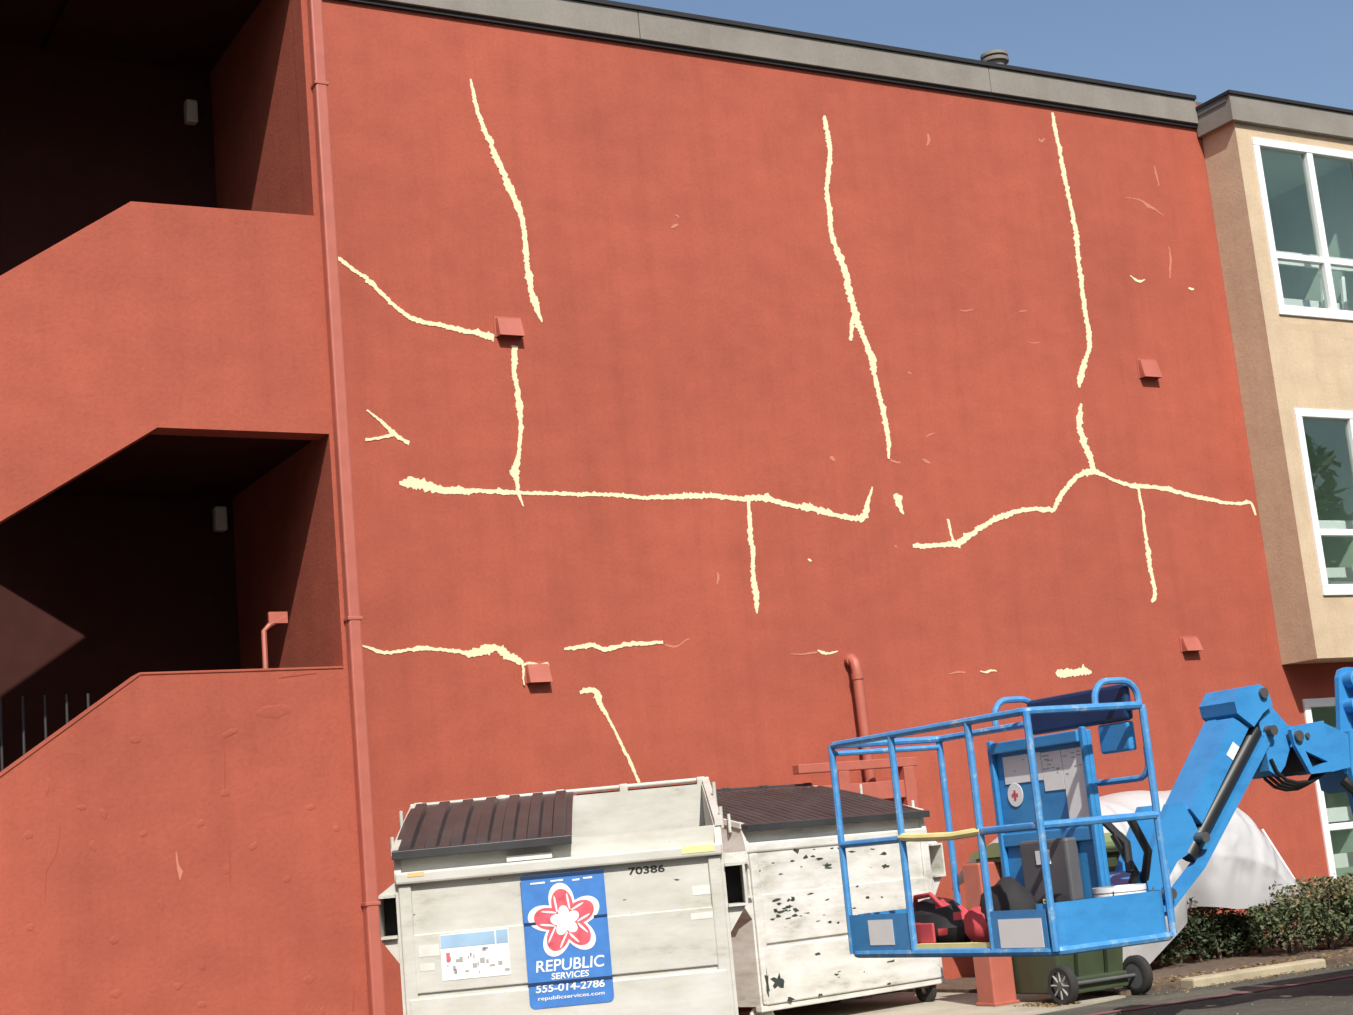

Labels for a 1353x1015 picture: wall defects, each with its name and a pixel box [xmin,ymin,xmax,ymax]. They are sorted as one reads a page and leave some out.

crack [470,79,543,322]
crack [338,257,873,614]
crack [823,116,891,459]
crack [912,112,1256,603]
crack [363,638,689,685]
crack [579,687,640,783]